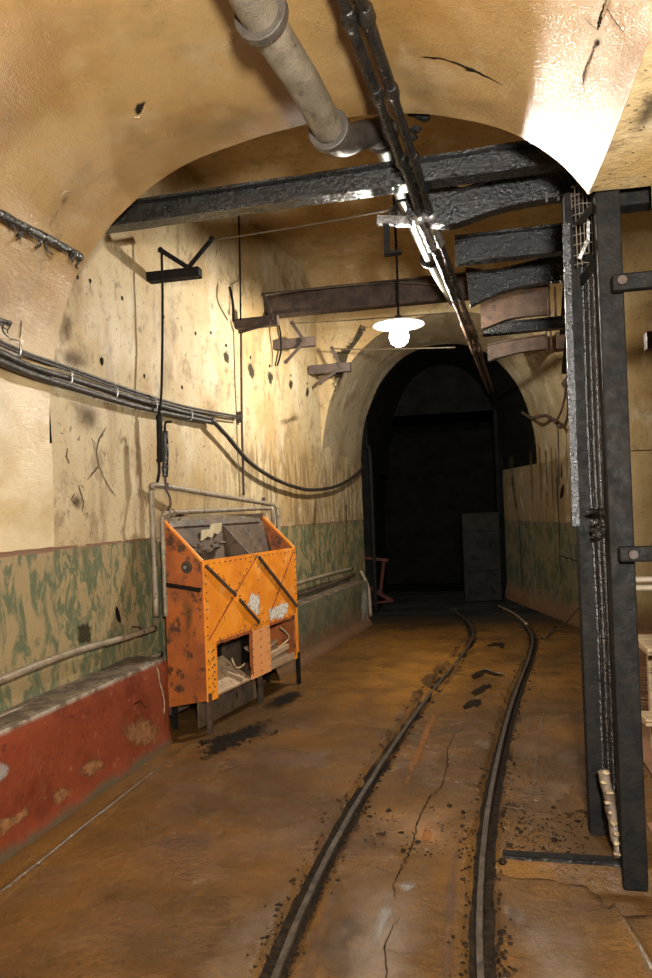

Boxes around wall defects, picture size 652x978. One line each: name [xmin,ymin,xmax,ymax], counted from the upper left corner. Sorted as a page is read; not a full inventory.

crack [582,0,623,86]
crack [383,728,462,978]